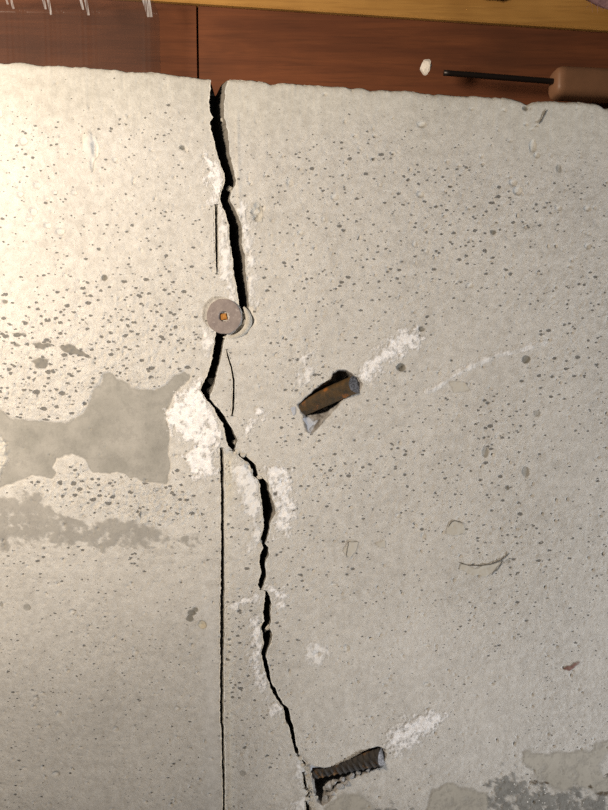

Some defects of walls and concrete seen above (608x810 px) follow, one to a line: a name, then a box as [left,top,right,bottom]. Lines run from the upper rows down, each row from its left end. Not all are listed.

peeling [0,372,189,486]
crack [199,80,318,810]
peeling [428,784,488,810]
damp [486,772,606,810]